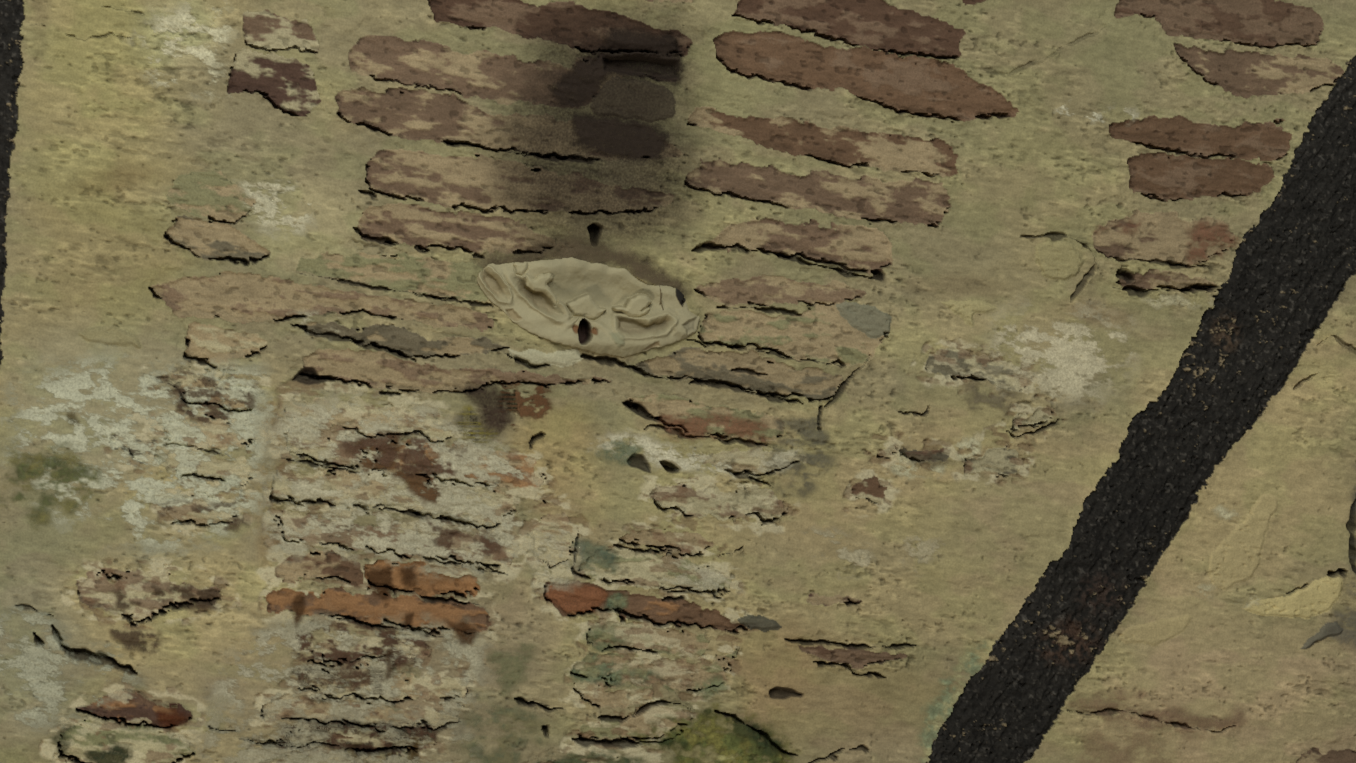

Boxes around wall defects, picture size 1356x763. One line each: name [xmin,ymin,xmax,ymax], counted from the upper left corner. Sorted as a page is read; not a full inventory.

spalling [38,0,1033,763]
spalling [841,299,1072,517]